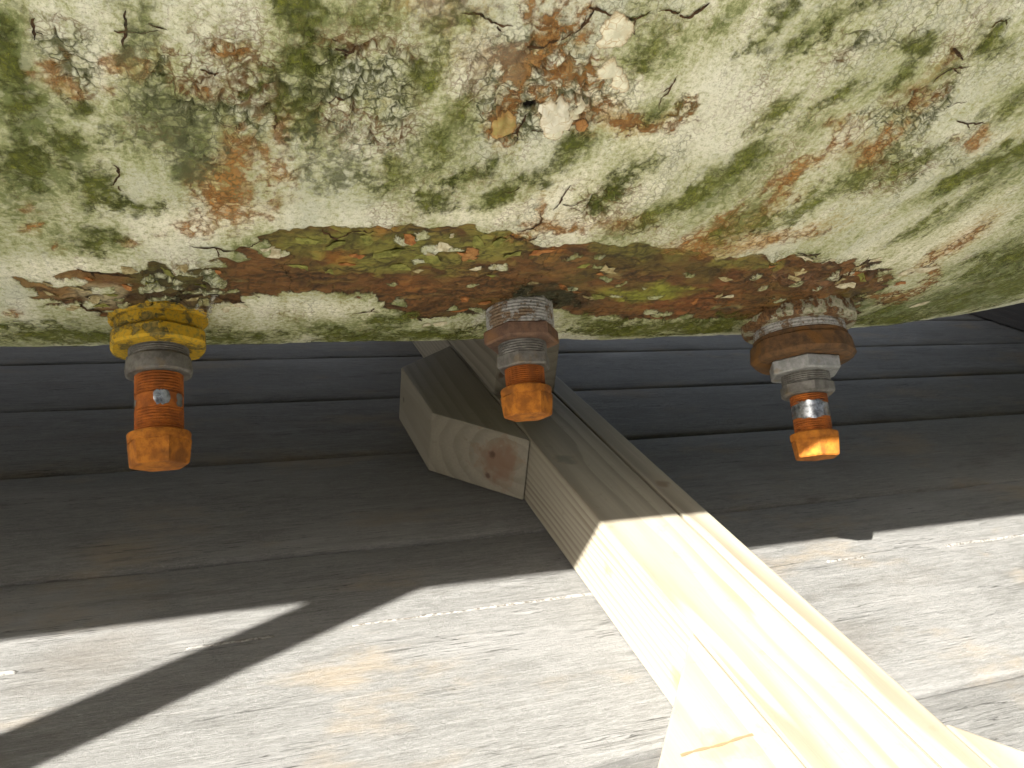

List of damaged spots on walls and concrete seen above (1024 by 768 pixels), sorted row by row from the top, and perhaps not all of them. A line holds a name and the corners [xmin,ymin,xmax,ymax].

crack [30,18,43,40]
crack [114,10,167,49]
crack [461,12,512,32]
crack [527,3,709,49]
damp [972,21,1012,61]
rust [99,55,151,78]
rust [173,109,295,238]
damp [298,116,499,214]
rust [659,88,936,259]
damp [106,194,166,219]
damp [73,226,129,259]
peeling [12,223,941,327]